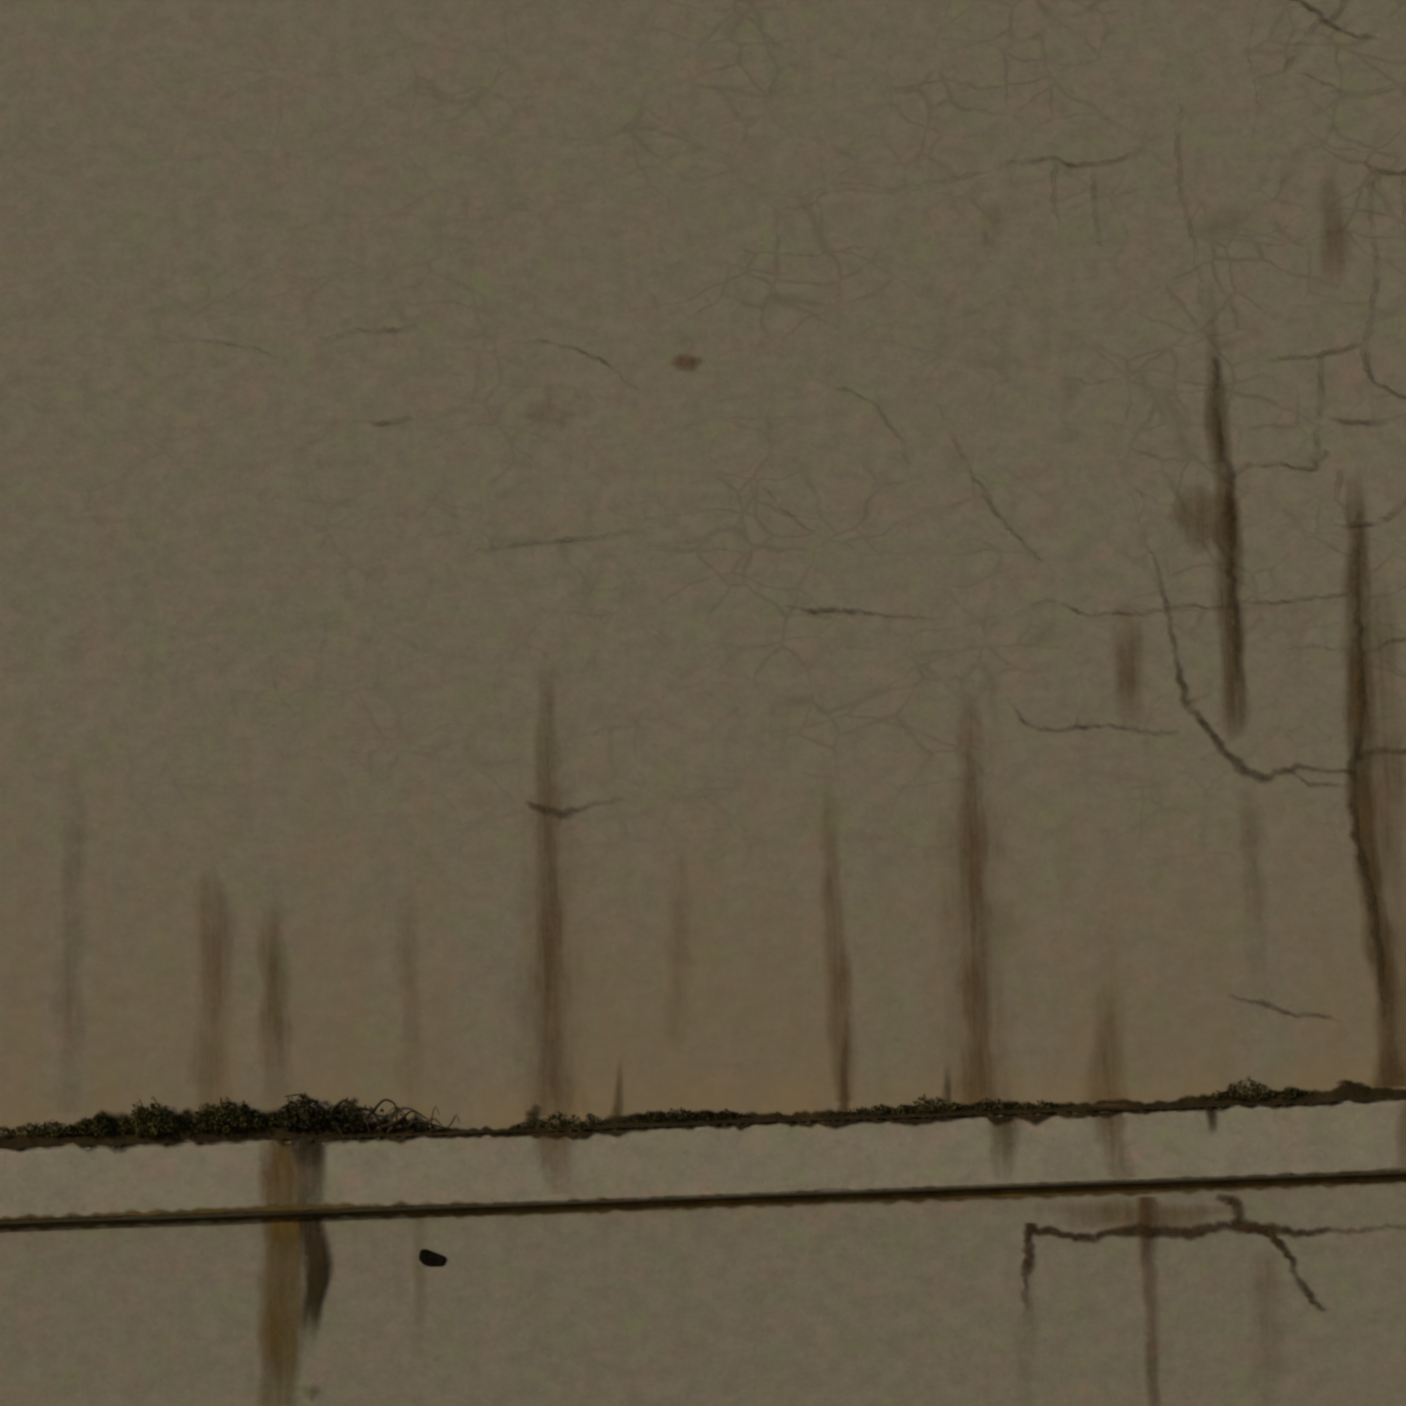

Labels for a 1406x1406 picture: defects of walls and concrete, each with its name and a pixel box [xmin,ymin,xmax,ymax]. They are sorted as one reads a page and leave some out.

crack [1300,2,1336,28]
crack [1194,430,1237,614]
leakage [1211,395,1242,715]
crack [1176,670,1288,780]
crack [1350,805,1383,979]
leakage [287,1114,329,1179]
crack [0,1080,1406,1151]
leakage [301,1217,329,1322]
crack [1022,1196,1328,1307]